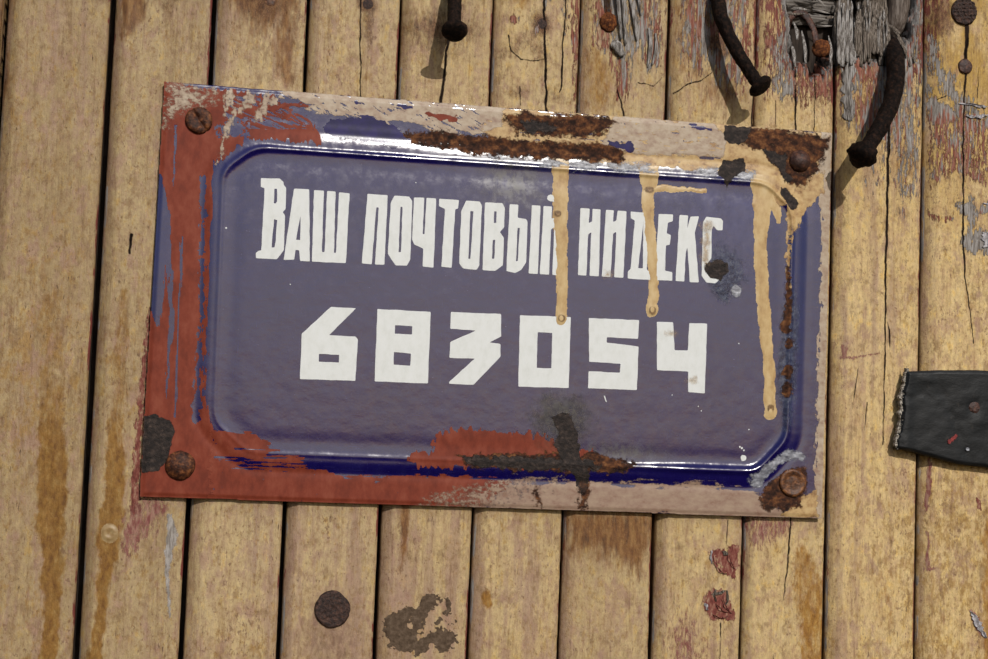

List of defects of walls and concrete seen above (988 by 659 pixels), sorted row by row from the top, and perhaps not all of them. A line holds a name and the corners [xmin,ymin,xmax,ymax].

crack [508,0,567,111]
peeling [545,0,747,113]
peeling [725,0,887,141]
peeling [865,0,988,219]
crack [853,128,891,445]
peeling [927,196,988,256]
crack [937,24,979,344]
damp [18,289,74,659]
damp [81,285,135,659]
peeling [382,593,461,657]
peeling [702,588,735,621]
peeling [708,516,792,580]